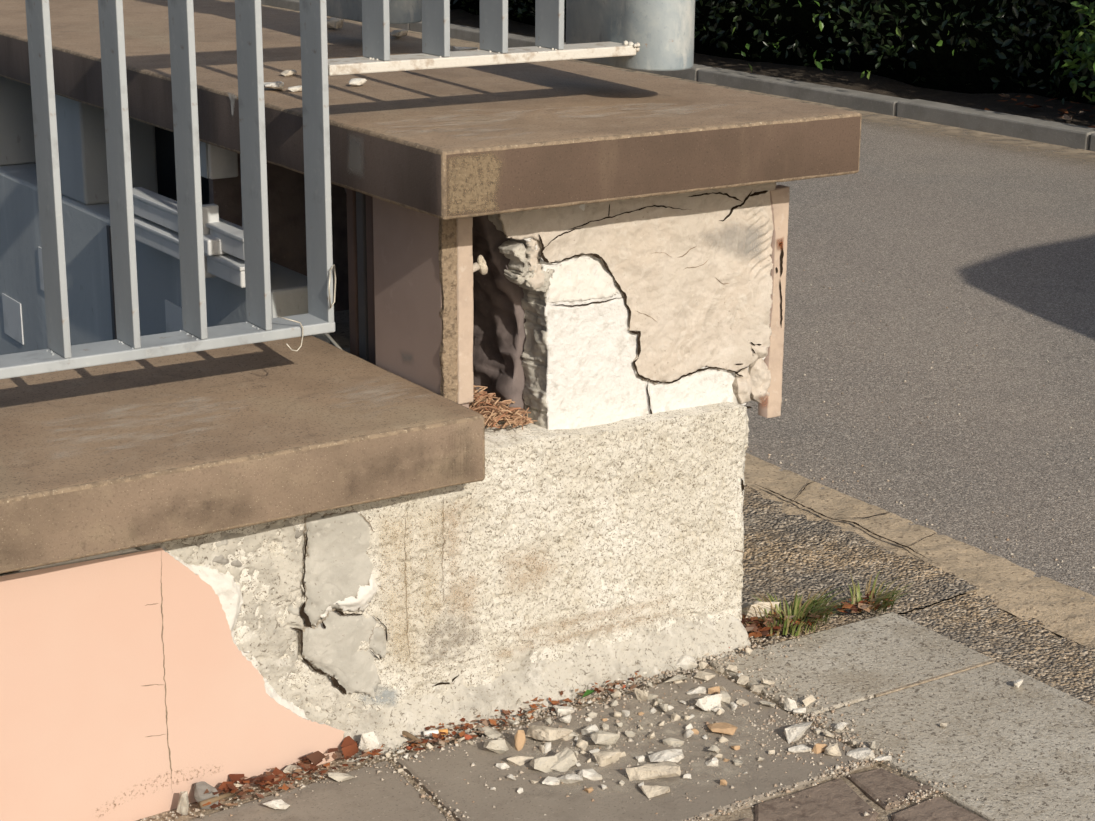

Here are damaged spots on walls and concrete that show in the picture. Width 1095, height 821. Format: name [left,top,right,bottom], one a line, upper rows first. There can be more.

spalling [498,237,771,430]
crack [539,190,784,414]
spalling [169,510,392,732]